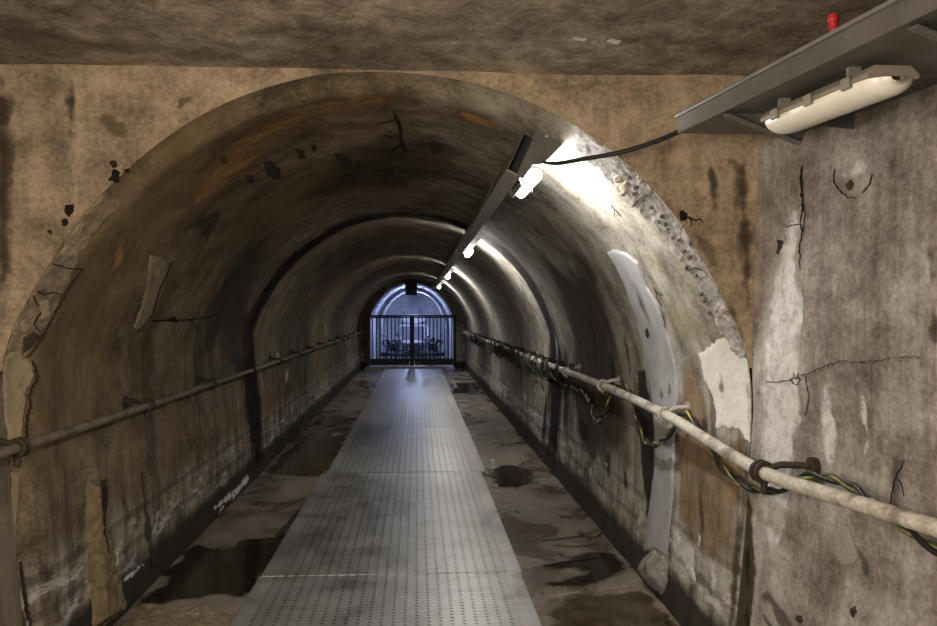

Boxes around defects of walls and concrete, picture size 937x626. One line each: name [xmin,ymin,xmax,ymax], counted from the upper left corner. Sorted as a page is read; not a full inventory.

spalling [2,160,129,440]
flaking render [133,254,172,332]
water stain [201,212,468,463]
water stain [476,232,654,517]
spalling [572,129,751,442]
crack [786,166,806,270]
crack [767,356,923,415]